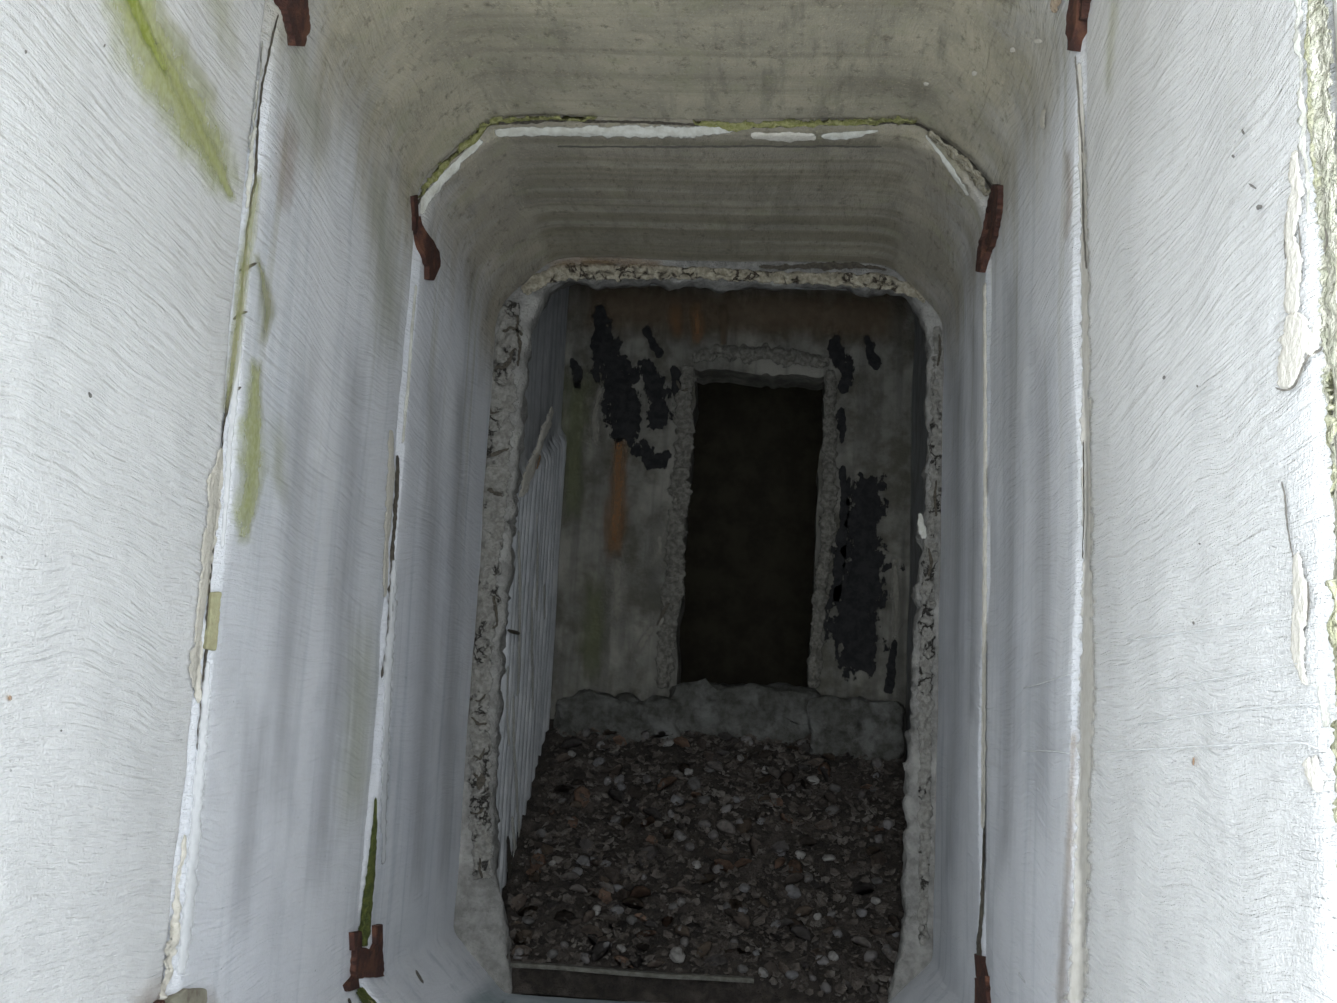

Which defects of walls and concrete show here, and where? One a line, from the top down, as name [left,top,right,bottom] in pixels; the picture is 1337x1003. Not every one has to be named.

damp [127,0,233,197]
peeling [1275,150,1323,391]
peeling [1281,482,1330,727]